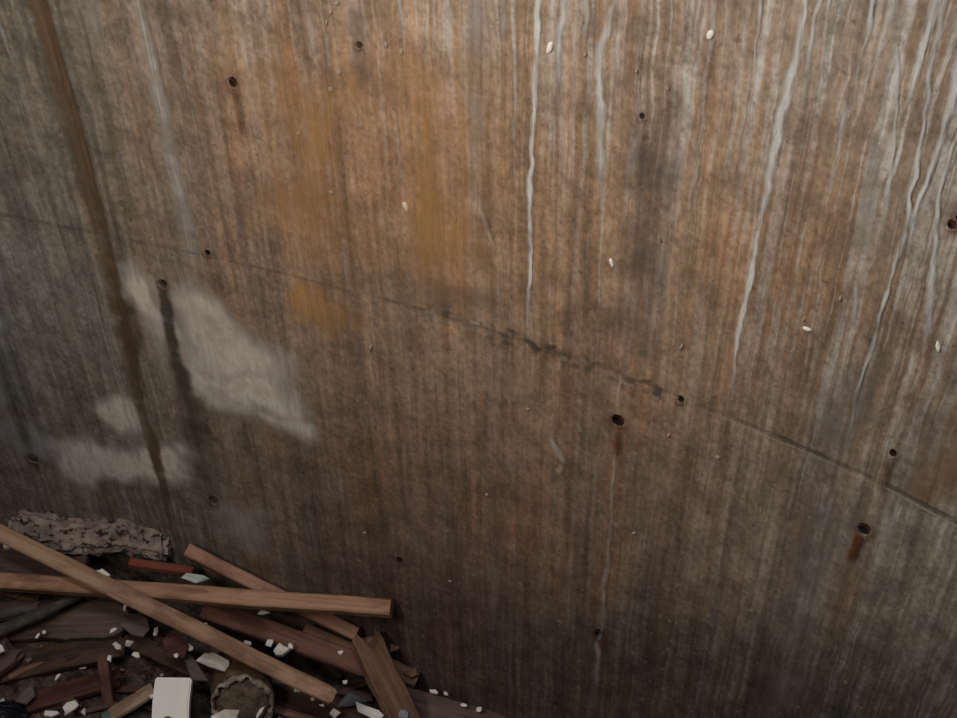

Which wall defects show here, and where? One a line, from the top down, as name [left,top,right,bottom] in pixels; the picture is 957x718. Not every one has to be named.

efflorescence [556,0,567,75]
leakage [863,0,875,48]
efflorescence [595,8,612,171]
efflorescence [526,0,542,300]
efflorescence [734,0,814,373]
efflorescence [878,0,957,333]
leakage [32,265,315,487]
crack [411,311,678,405]
efflorescence [854,337,876,399]
crack [754,426,859,472]
crack [880,483,957,527]